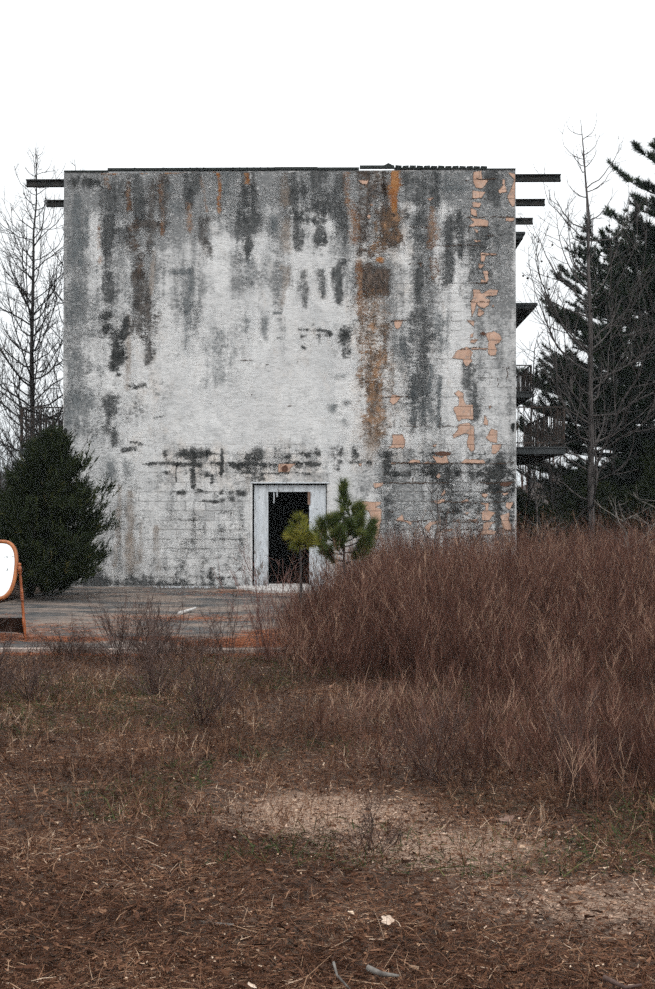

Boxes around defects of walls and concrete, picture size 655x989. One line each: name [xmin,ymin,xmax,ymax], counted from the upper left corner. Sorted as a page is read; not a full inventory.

leakage [67,172,201,376]
leakage [221,172,278,278]
rust [357,263,392,444]
rust [371,171,400,263]
leakage [280,170,514,431]
peeling [452,170,502,366]
peeling [498,172,515,222]
leakage [64,394,143,479]
leakage [144,443,516,563]
peeling [362,501,382,539]
peeling [408,444,451,479]
peeling [425,482,513,547]